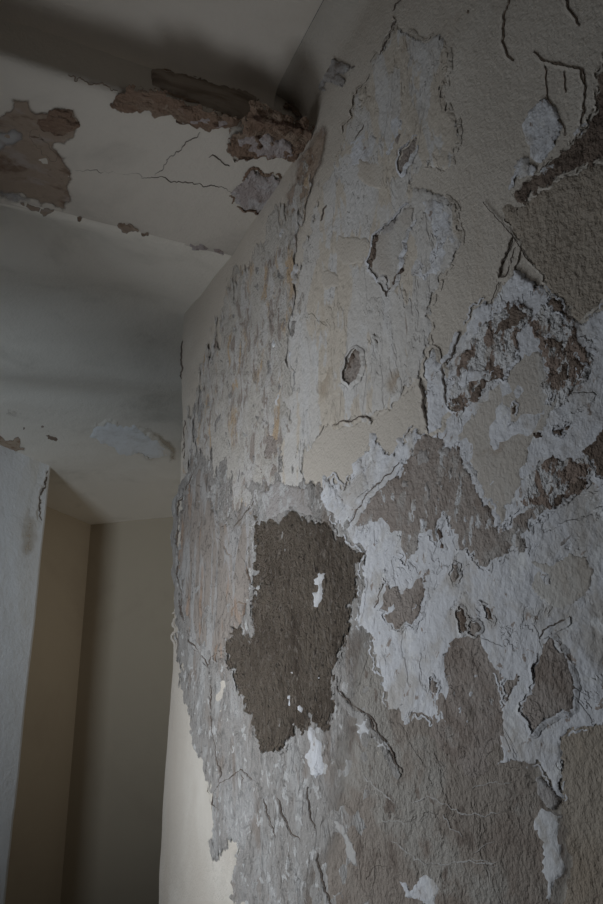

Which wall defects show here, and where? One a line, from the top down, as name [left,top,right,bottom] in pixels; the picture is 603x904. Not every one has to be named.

crack [498,0,586,140]
crack [85,132,232,193]
peeling [110,25,603,904]
crack [331,687,402,780]